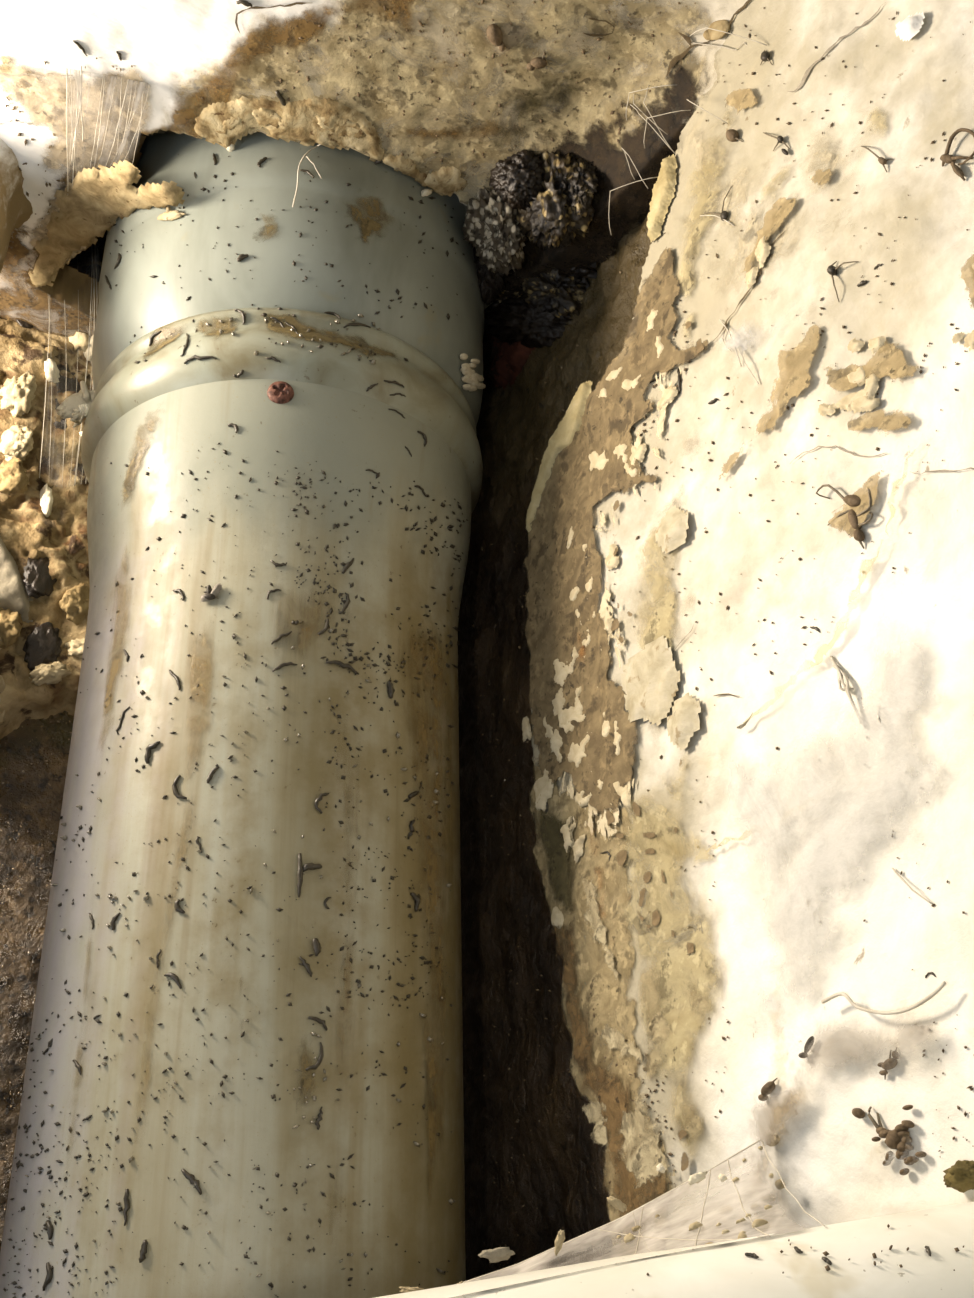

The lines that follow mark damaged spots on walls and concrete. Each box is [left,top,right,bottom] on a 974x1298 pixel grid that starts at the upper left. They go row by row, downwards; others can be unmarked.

crack [666,0,751,77]
flaking render [194,95,468,197]
water stain [166,0,710,348]
water stain [678,143,787,295]
peeling [961,254,974,307]
peeling [756,325,918,435]
peeling [952,330,974,351]
peeling [719,444,743,479]
water stain [638,531,676,650]
flaking render [457,150,708,1284]
spalling [656,1130,727,1185]